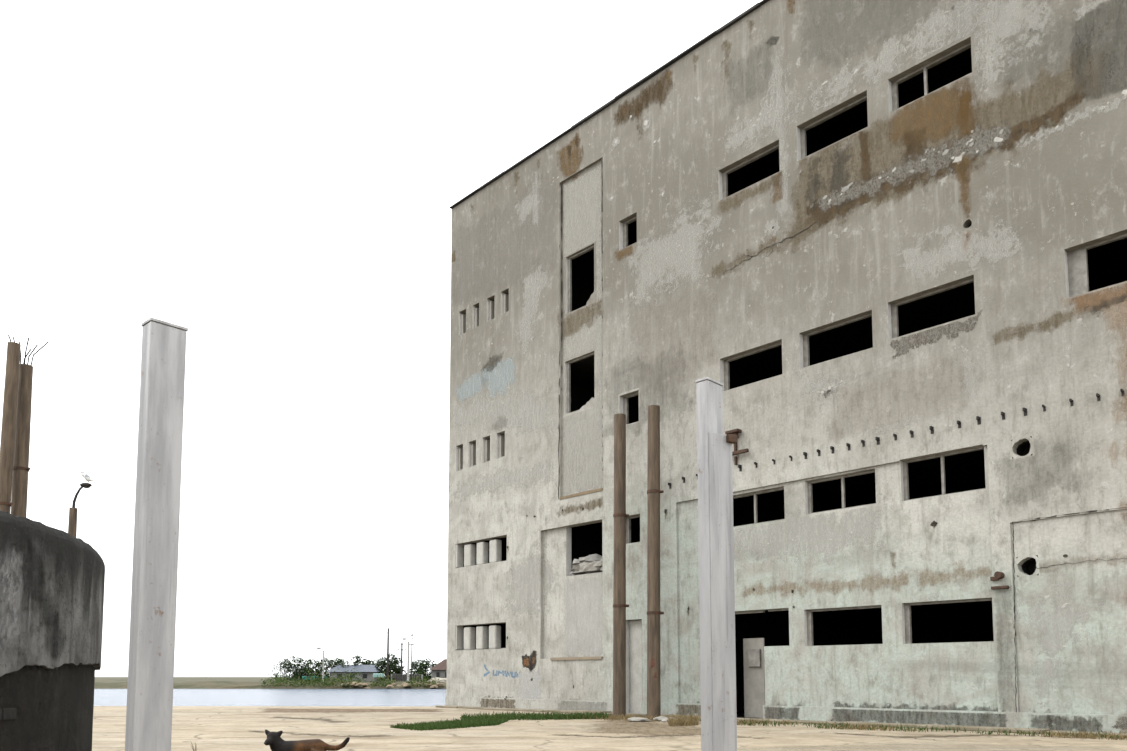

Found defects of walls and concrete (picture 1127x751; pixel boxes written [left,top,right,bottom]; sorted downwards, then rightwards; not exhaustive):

rust [560,133,583,179]
rust [615,71,672,132]
peeling [725,0,1056,241]
water stain [793,0,1127,246]
rust [955,155,970,218]
flaking render [809,90,1127,214]
crack [712,220,818,277]
water stain [0,540,64,659]